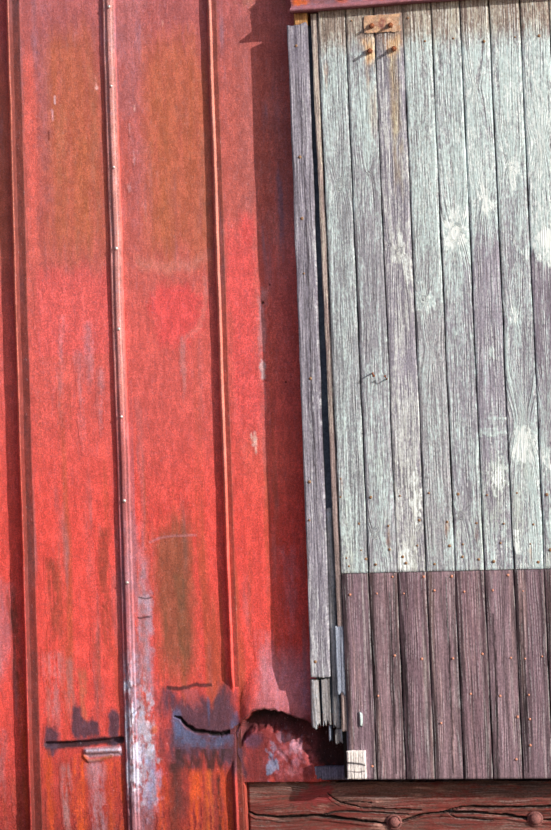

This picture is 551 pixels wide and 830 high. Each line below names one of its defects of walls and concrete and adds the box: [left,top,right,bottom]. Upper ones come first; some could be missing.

peeling [122,539,245,825]
peeling [261,725,336,809]
crack [249,792,551,824]